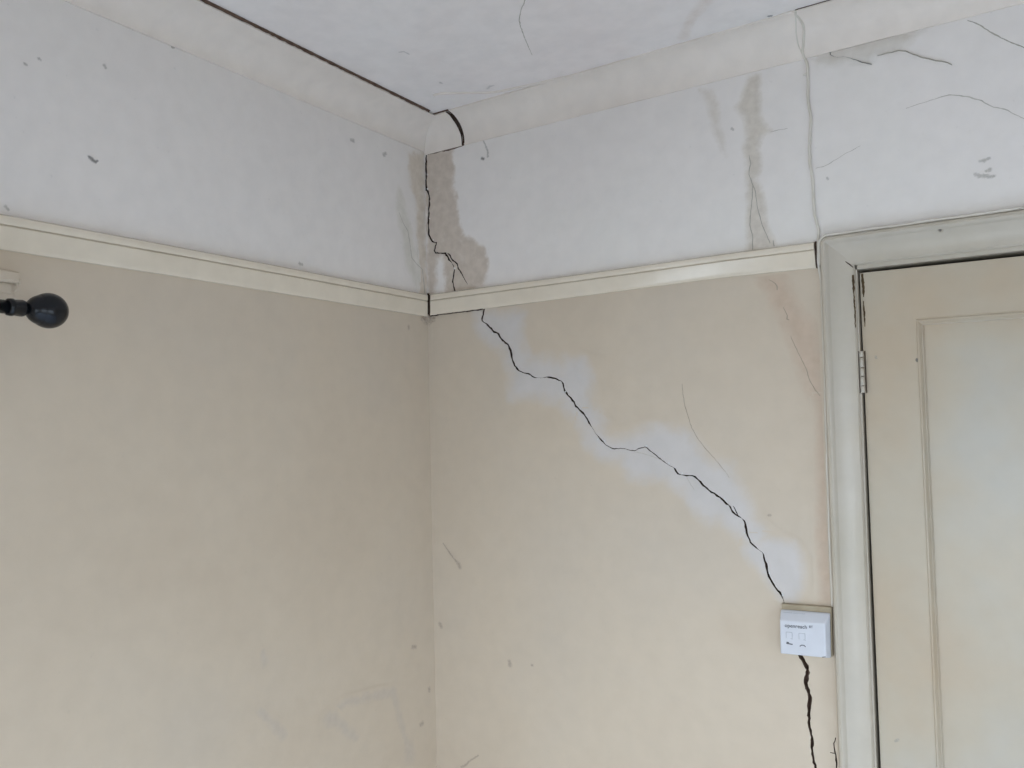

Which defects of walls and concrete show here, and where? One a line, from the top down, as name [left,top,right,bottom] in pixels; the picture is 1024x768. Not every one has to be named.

leakage [393,147,492,294]
leakage [695,70,780,251]
crack [830,50,952,65]
crack [908,94,1024,119]
crack [967,20,1024,48]
crack [201,0,784,601]
leakage [749,273,830,606]
crack [798,655,837,768]